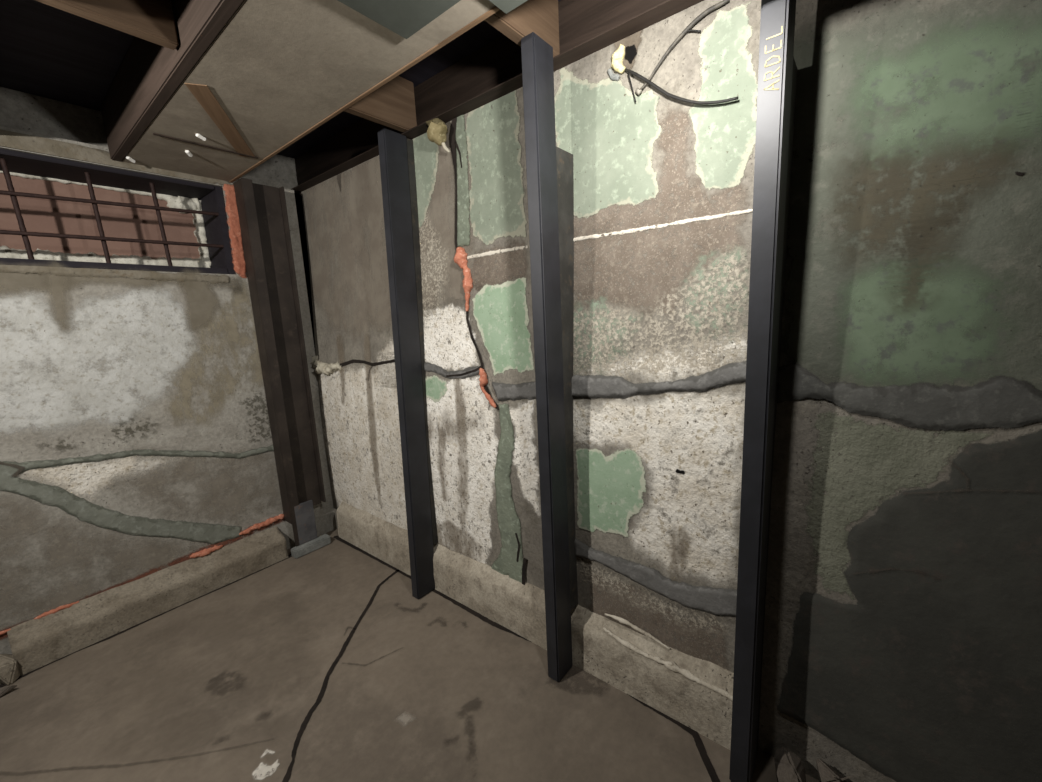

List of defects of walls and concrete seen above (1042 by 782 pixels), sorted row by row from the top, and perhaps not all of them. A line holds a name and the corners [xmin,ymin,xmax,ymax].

crack [450,117,462,250]
peeling [554,67,662,218]
spalling [614,30,643,69]
peeling [688,3,758,190]
leakage [0,266,280,519]
crack [446,311,499,410]
peeling [472,277,534,376]
peeling [575,448,646,537]
leakage [0,498,182,616]
corrosion [34,514,284,619]
crack [282,533,539,782]
crack [628,694,720,782]